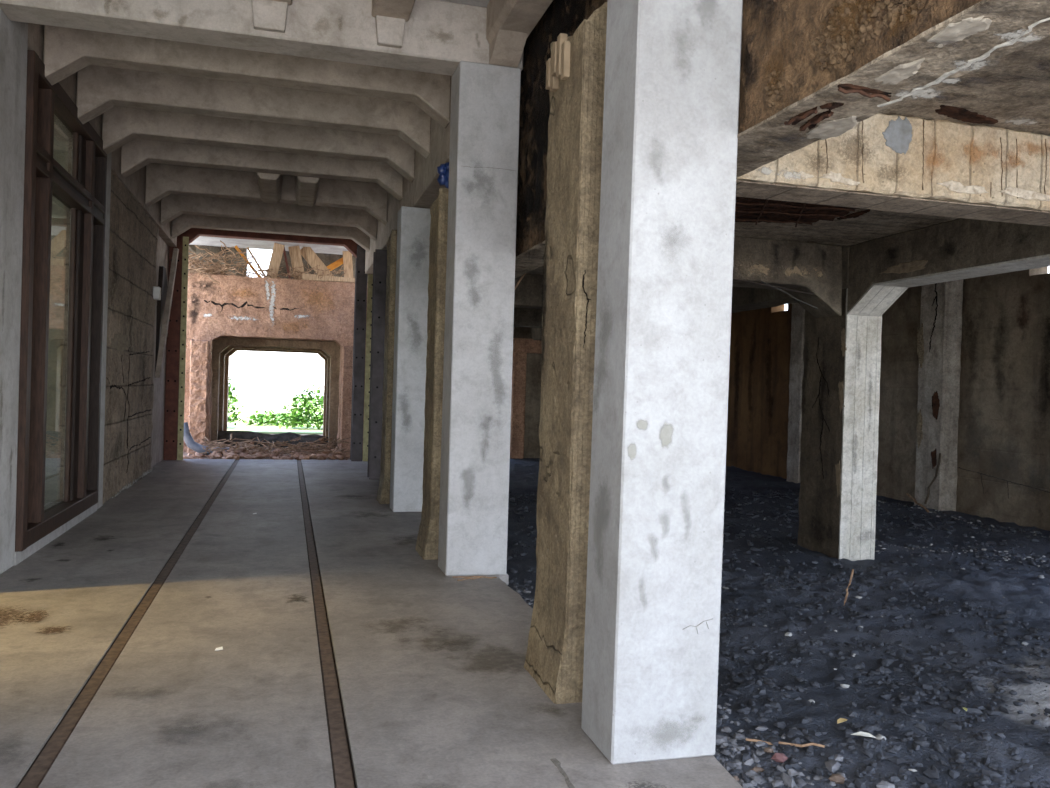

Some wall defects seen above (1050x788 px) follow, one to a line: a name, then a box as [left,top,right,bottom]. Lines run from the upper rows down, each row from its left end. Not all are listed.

peeling [927,15,992,48]
peeling [784,58,925,140]
spalling [935,105,998,124]
spalling [793,171,860,186]
spalling [937,180,1050,201]
spalling [735,196,870,227]
crack [204,300,303,311]
crack [929,283,938,352]
crack [550,758,575,788]